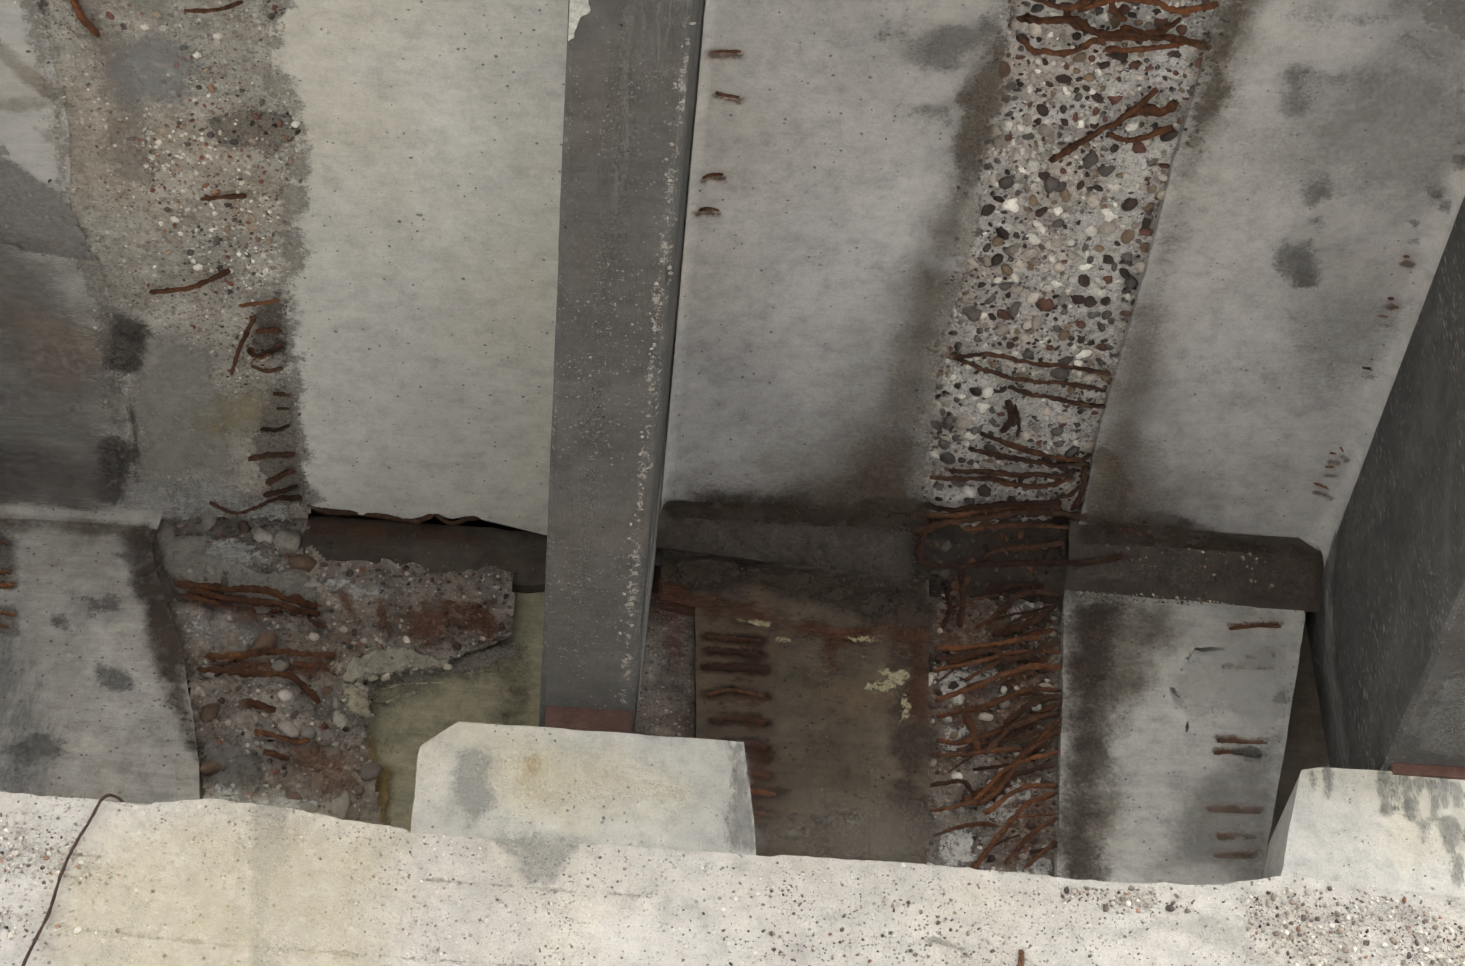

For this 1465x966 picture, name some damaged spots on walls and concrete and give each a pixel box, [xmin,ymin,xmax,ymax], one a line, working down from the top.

peeling [568,0,590,41]
rust [710,49,742,59]
rust [715,91,742,104]
rust [695,207,720,216]
rust [702,172,726,183]
leakage [1273,242,1320,288]
spalling [615,2,697,704]
leakage [0,238,200,751]
spalling [0,0,536,966]
spalling [700,0,1465,966]
leakage [1054,421,1349,880]
leakage [1377,768,1465,885]